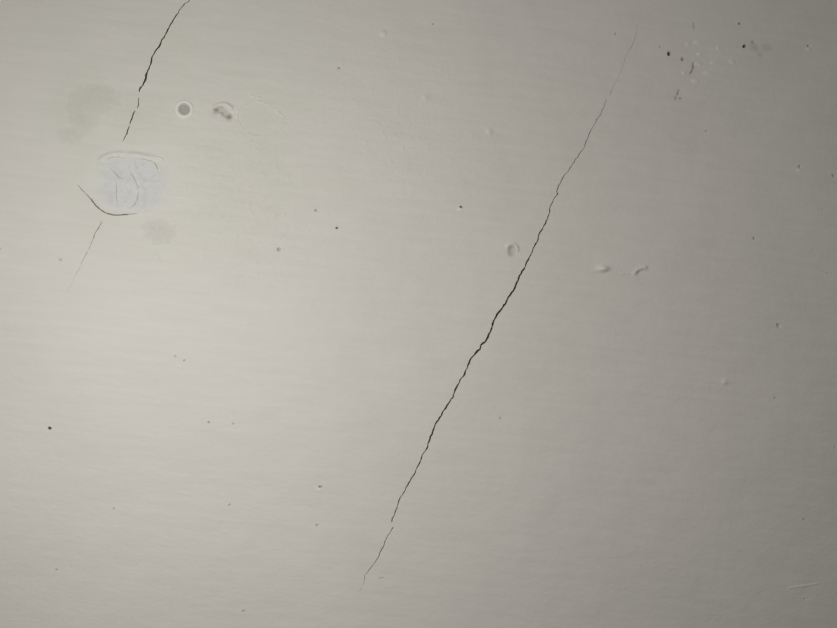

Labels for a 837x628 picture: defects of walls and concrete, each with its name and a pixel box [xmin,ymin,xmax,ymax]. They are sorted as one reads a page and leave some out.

crack [122,0,190,142]
crack [360,31,637,590]